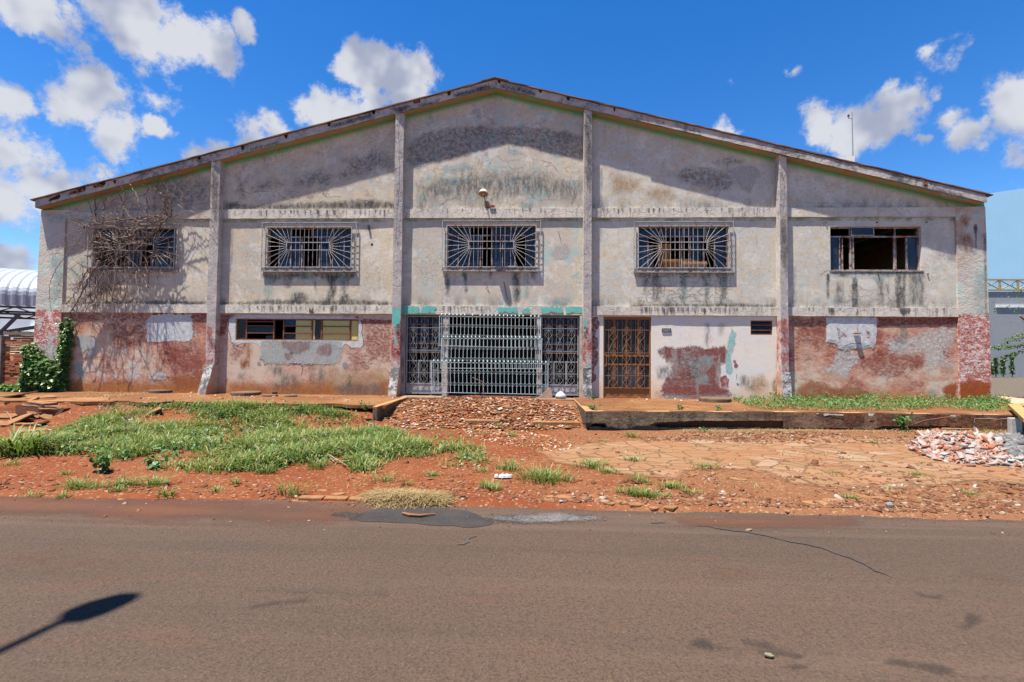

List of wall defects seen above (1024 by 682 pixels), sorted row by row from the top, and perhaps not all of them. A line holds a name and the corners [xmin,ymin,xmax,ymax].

leakage [409,115,592,183]
leakage [423,175,577,210]
leakage [827,272,924,315]
peeling [35,318,58,365]
flaking render [63,306,437,380]
peeling [498,307,600,382]
flaking render [658,330,738,399]
peeling [781,318,826,349]
peeling [825,317,957,395]
crack [697,525,892,577]